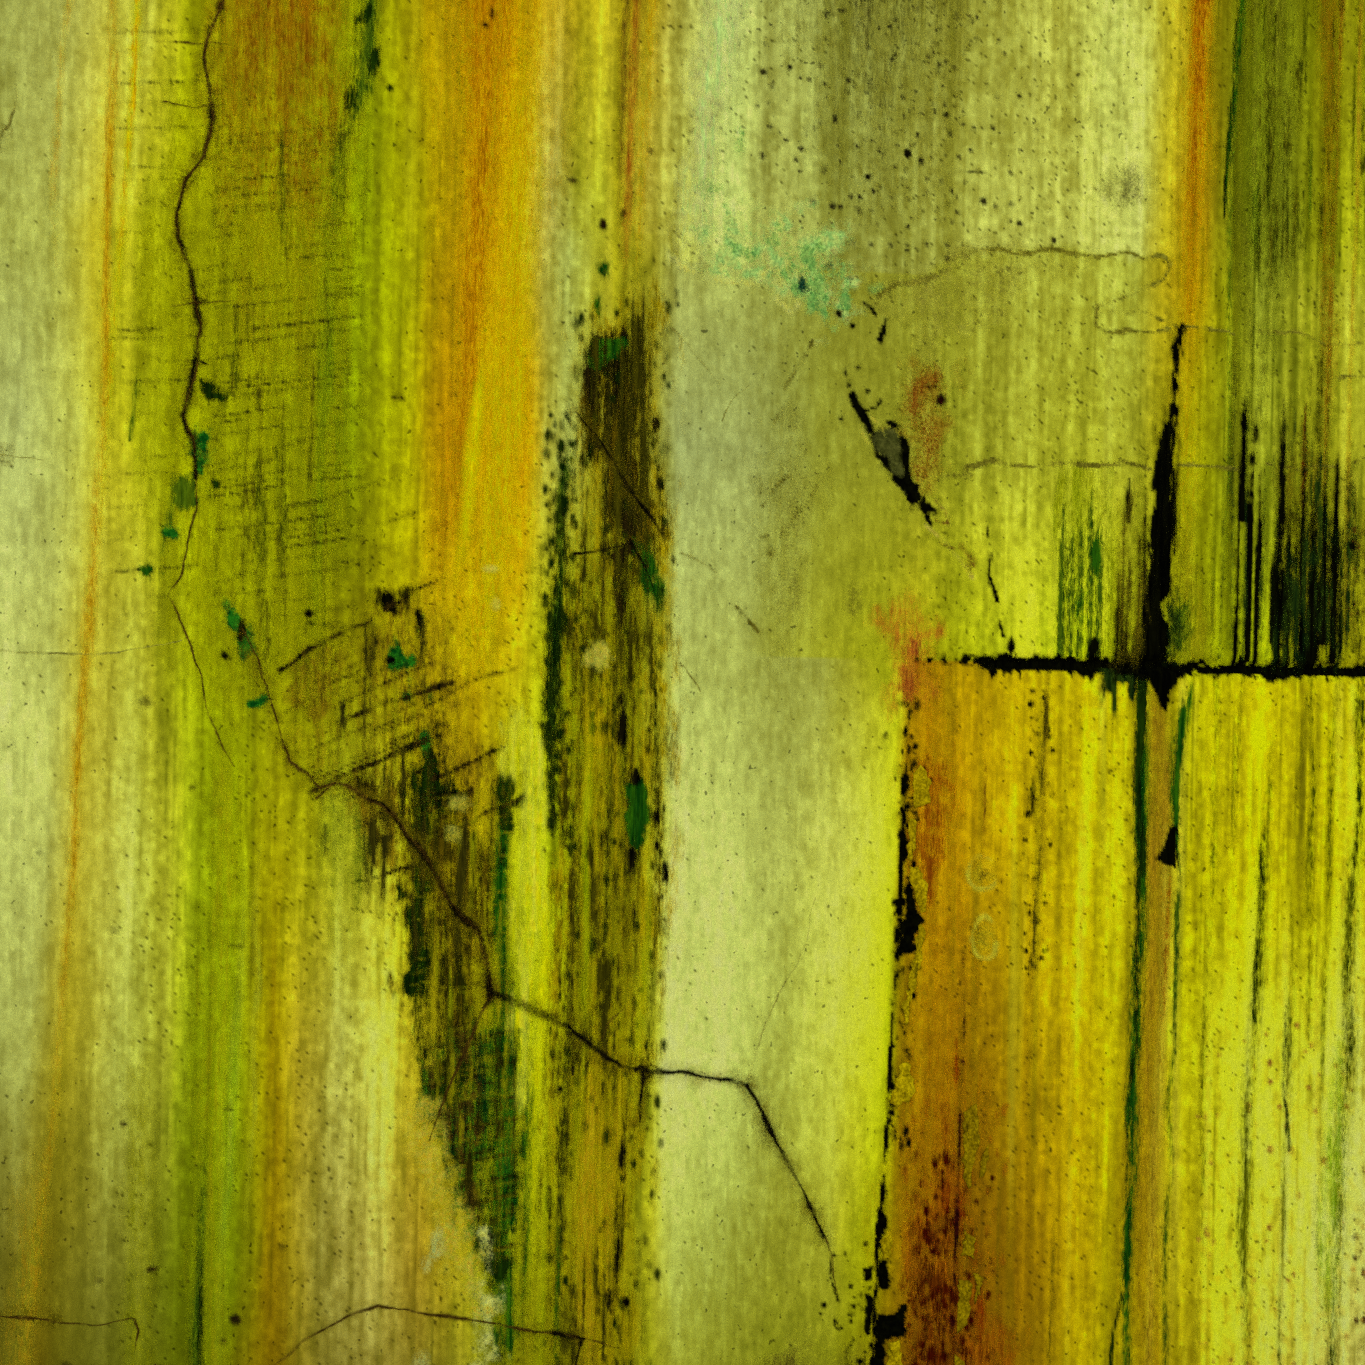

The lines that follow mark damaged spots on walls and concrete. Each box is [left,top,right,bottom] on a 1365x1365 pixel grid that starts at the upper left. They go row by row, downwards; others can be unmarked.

crack [18,0,235,767]
spalling [839,366,949,537]
damp [876,246,1168,320]
damp [1028,690,1055,756]
crack [916,637,1365,714]
damp [397,298,665,1365]
rust [907,764,948,903]
damp [1023,769,1052,976]
damp [1052,294,1365,1365]
crack [242,629,932,1365]
crack [0,1310,156,1365]
rust [902,1110,1015,1365]